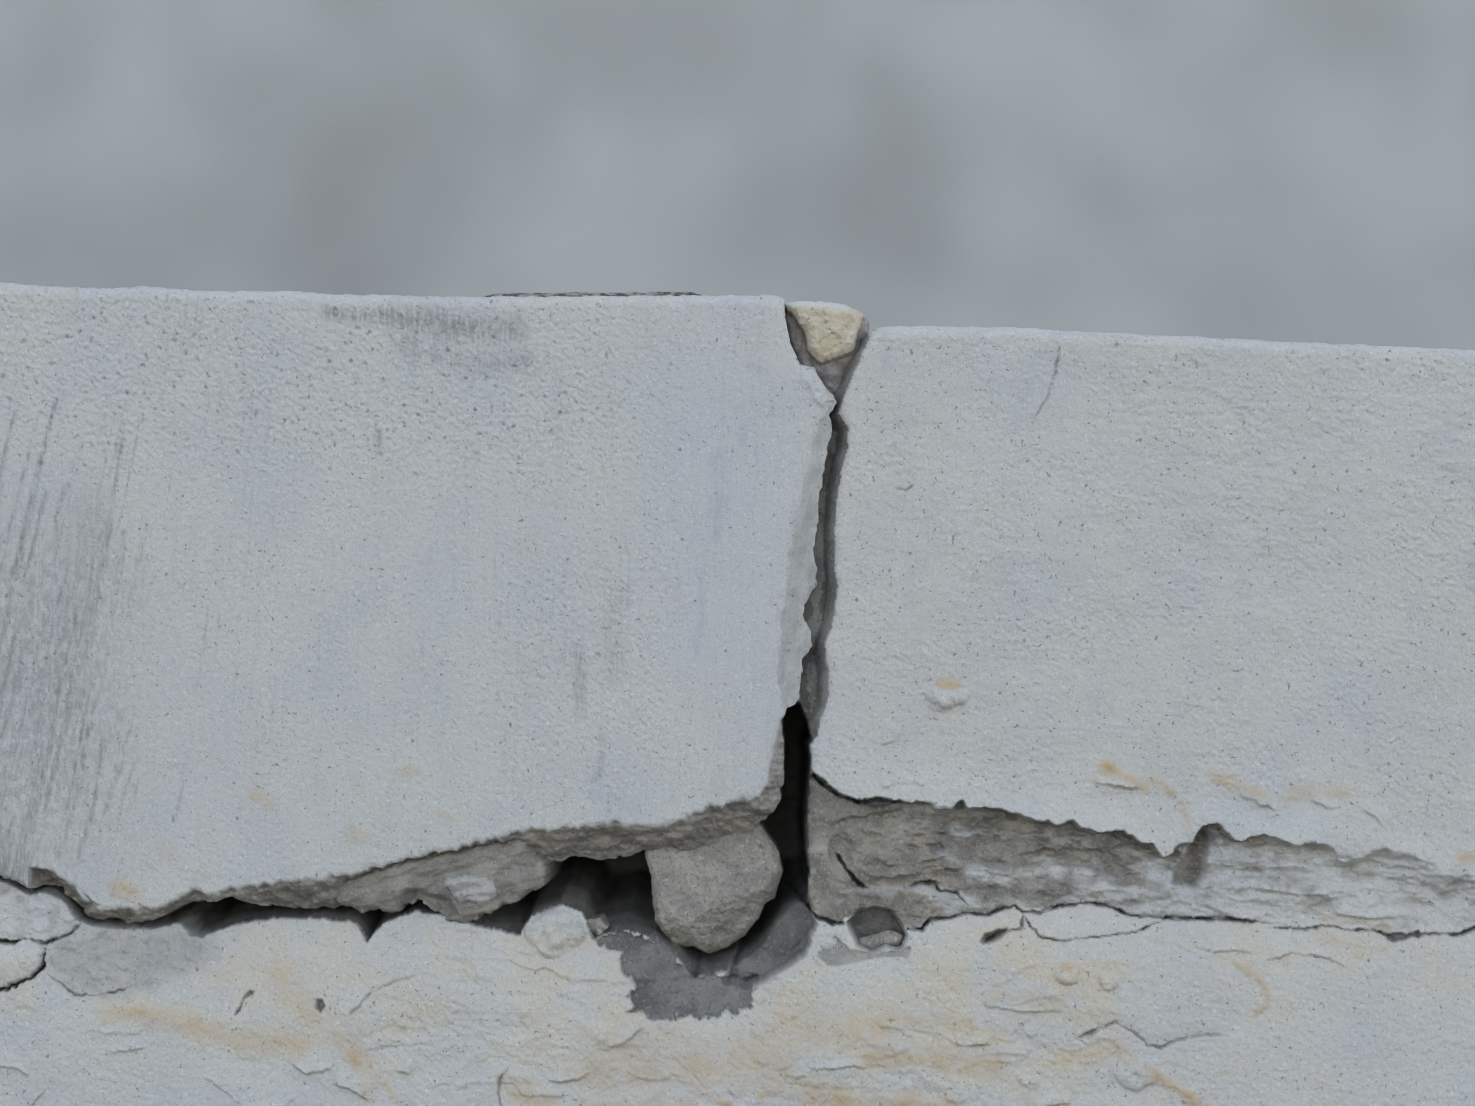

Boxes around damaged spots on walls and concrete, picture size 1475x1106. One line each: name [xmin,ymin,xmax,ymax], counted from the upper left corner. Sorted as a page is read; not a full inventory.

crack [1031,348,1063,428]
crack [817,387,839,526]
crack [895,484,916,494]
crack [761,581,1475,947]
crack [0,850,738,999]
spalling [597,774,1475,1023]
crack [233,990,258,1018]
crack [346,973,420,1019]
crack [1068,1020,1230,1052]
crack [497,1064,512,1106]